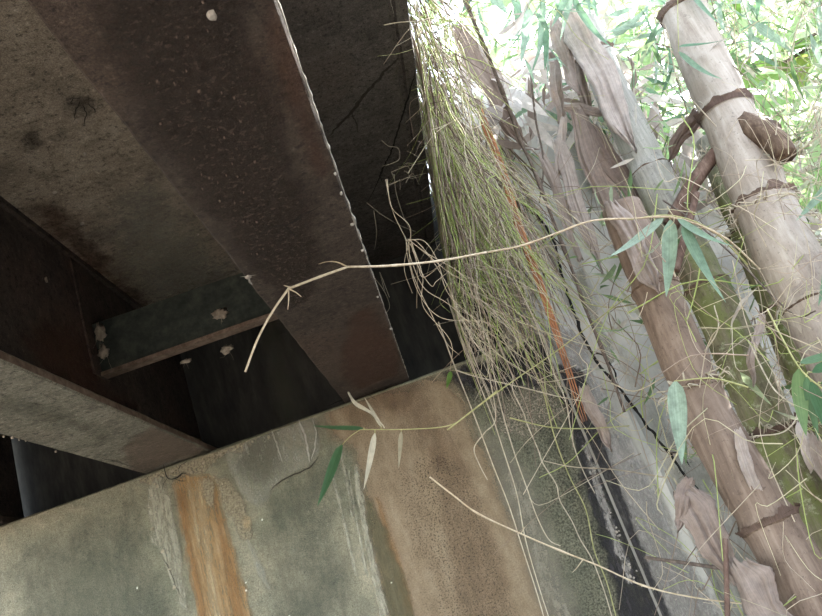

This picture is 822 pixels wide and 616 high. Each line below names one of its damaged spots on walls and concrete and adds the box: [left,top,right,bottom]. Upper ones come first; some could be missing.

crack [330,58,399,136]
crack [366,68,417,203]
damp [277,0,668,616]
corrosion [173,473,251,616]